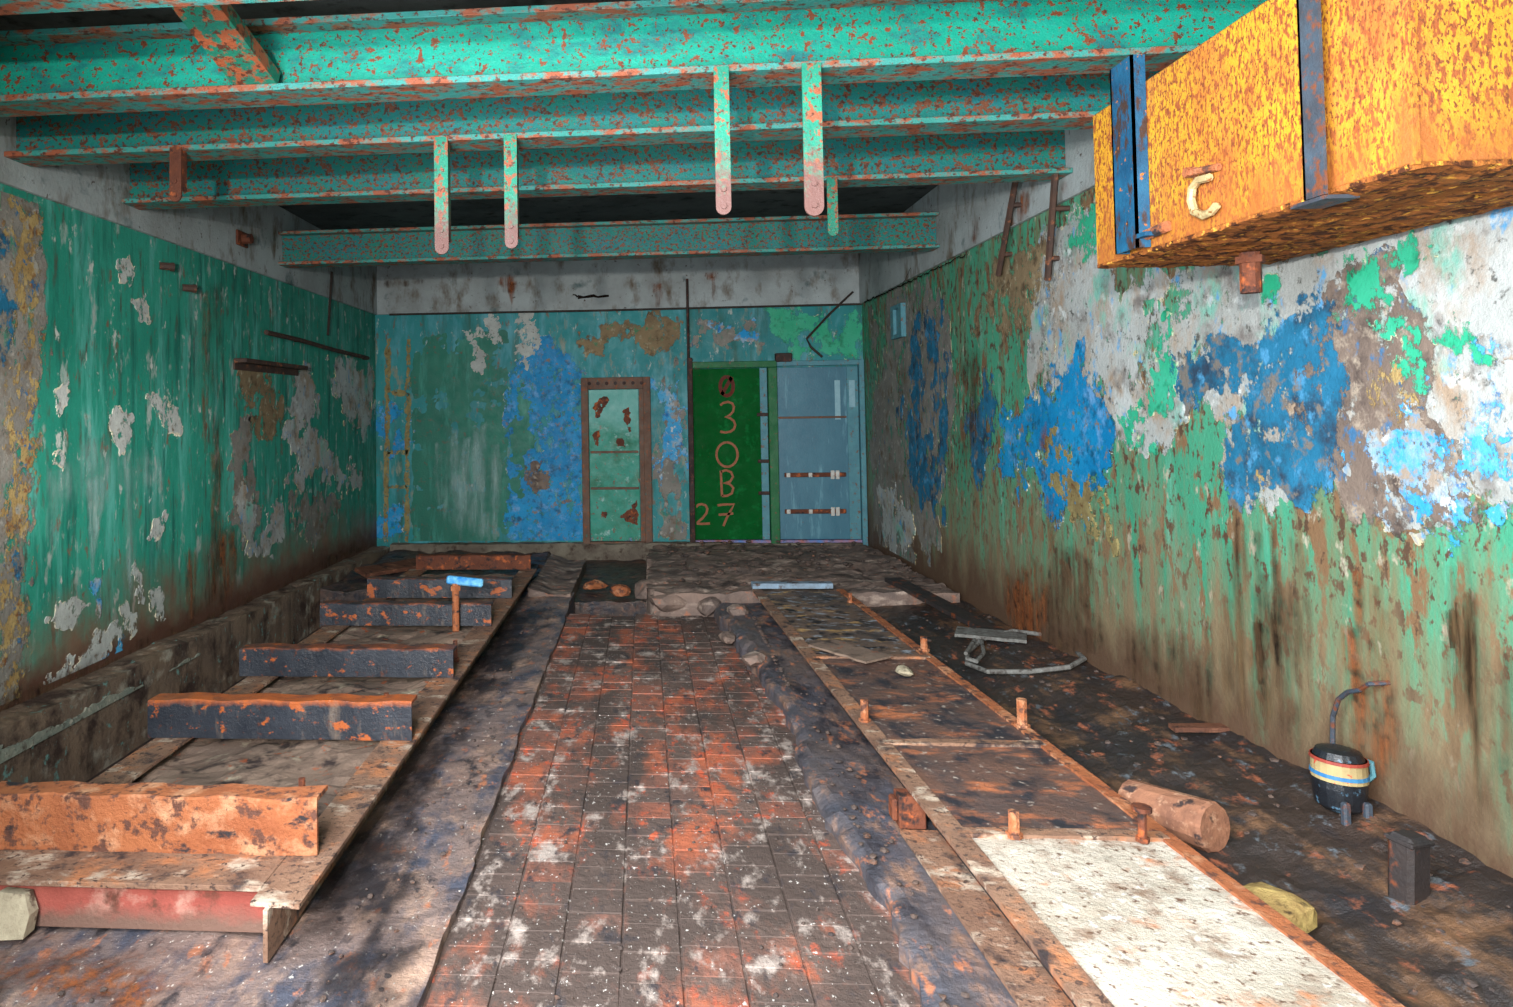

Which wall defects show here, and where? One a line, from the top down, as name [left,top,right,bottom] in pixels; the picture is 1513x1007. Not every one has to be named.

peeling [0,191,169,706]
peeling [145,391,183,437]
peeling [227,355,416,560]
peeling [462,313,541,499]
peeling [576,310,765,540]
peeling [970,203,1513,557]